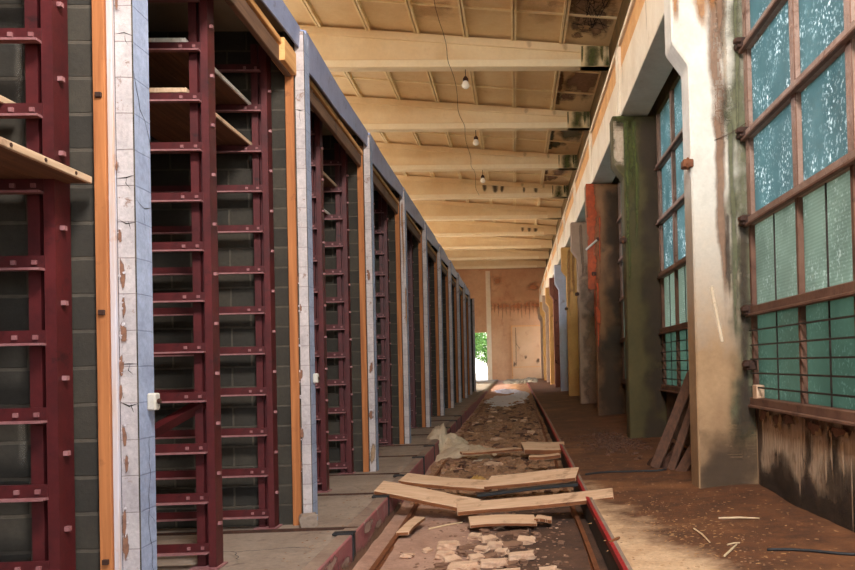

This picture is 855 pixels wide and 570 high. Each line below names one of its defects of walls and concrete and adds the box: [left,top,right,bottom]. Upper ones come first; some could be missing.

peeling [570,0,614,38]
leakage [579,119,666,438]
leakage [700,0,855,533]